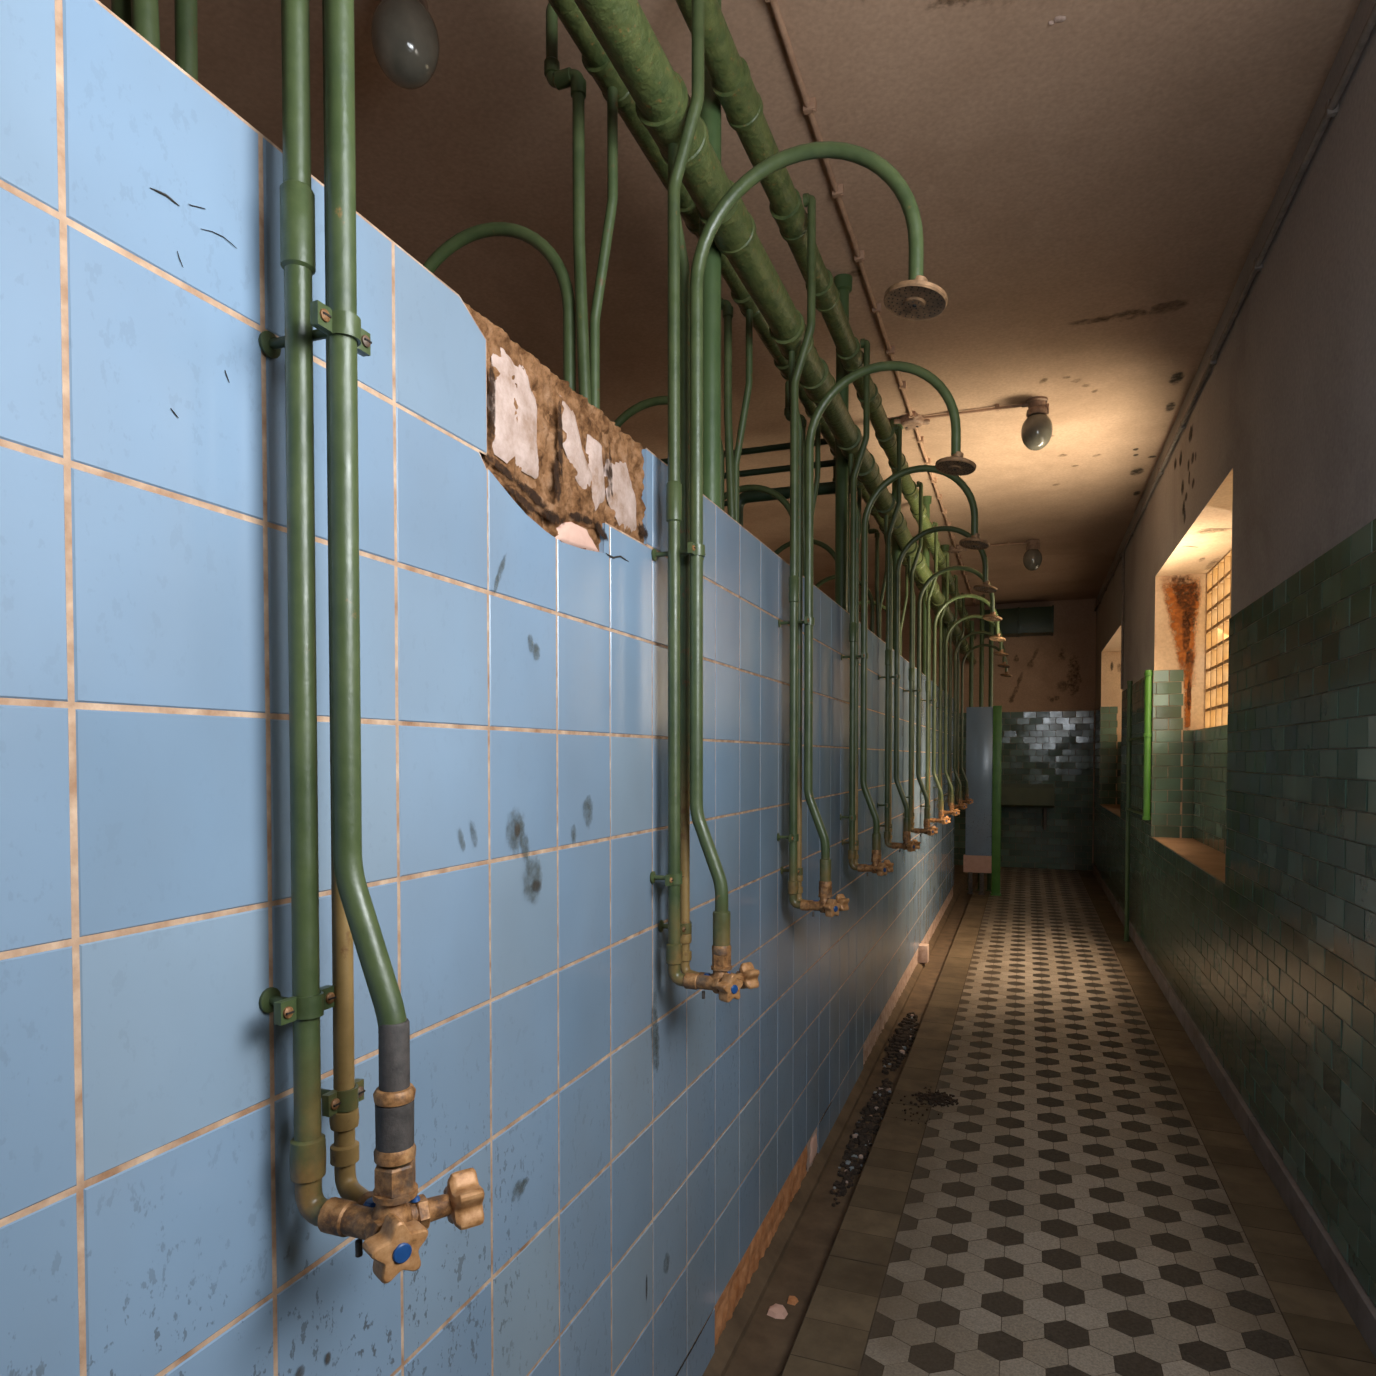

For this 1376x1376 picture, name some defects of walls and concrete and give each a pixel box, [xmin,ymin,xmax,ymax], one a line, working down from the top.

crack [150,187,236,267]
spalling [464,303,648,552]
leakage [511,818,540,899]